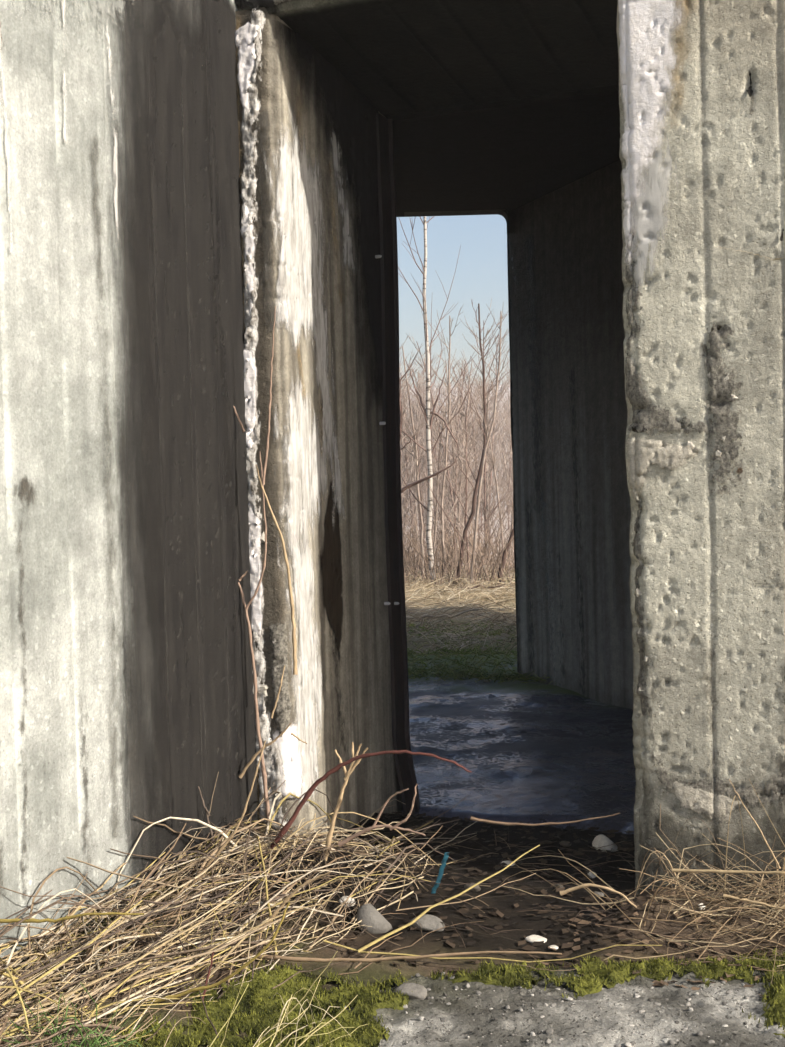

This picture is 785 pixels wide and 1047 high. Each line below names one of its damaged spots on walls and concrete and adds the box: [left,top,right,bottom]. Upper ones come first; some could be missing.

leakage [16,478,35,502]
leakage [26,0,383,898]
spalling [625,255,751,715]
leakage [639,815,785,895]